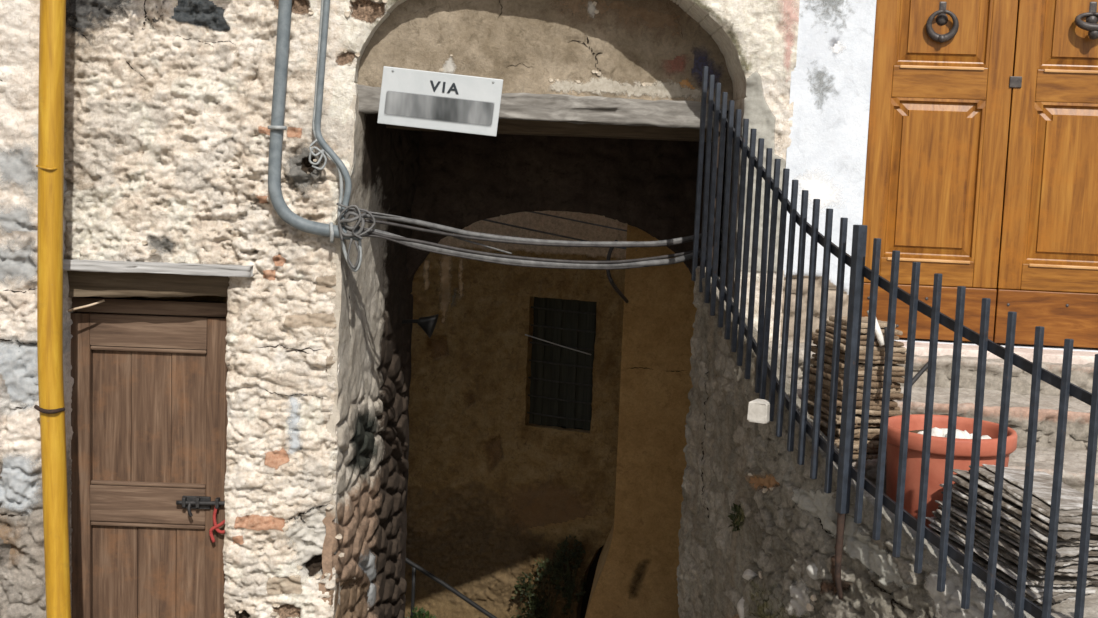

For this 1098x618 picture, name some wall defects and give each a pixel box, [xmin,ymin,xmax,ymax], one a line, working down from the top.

leakage [66,0,134,46]
leakage [142,0,230,31]
spalling [344,0,388,24]
leakage [813,0,844,24]
crack [571,14,604,76]
crack [255,345,320,354]